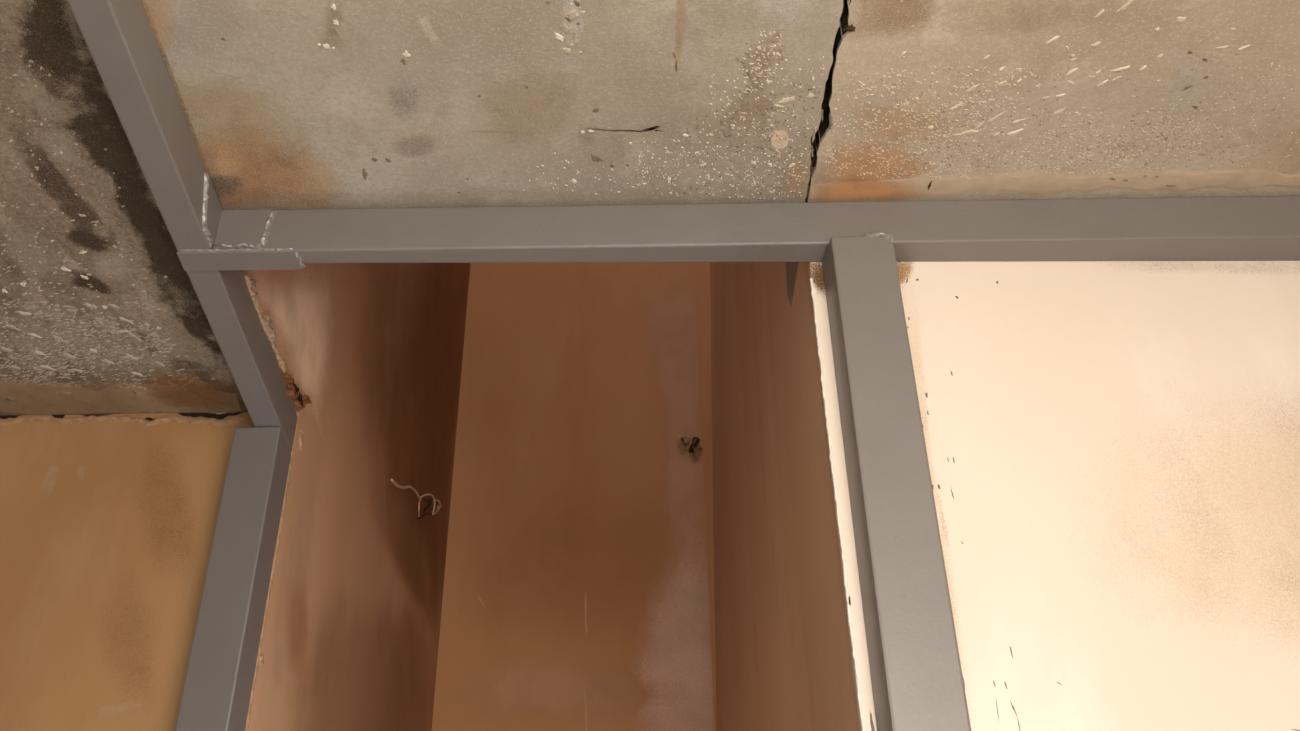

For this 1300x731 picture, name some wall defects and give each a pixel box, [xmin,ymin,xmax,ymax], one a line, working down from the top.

water stain [0,0,246,415]
flaking render [244,274,312,412]
crack [805,0,856,203]
water stain [1053,355,1300,673]